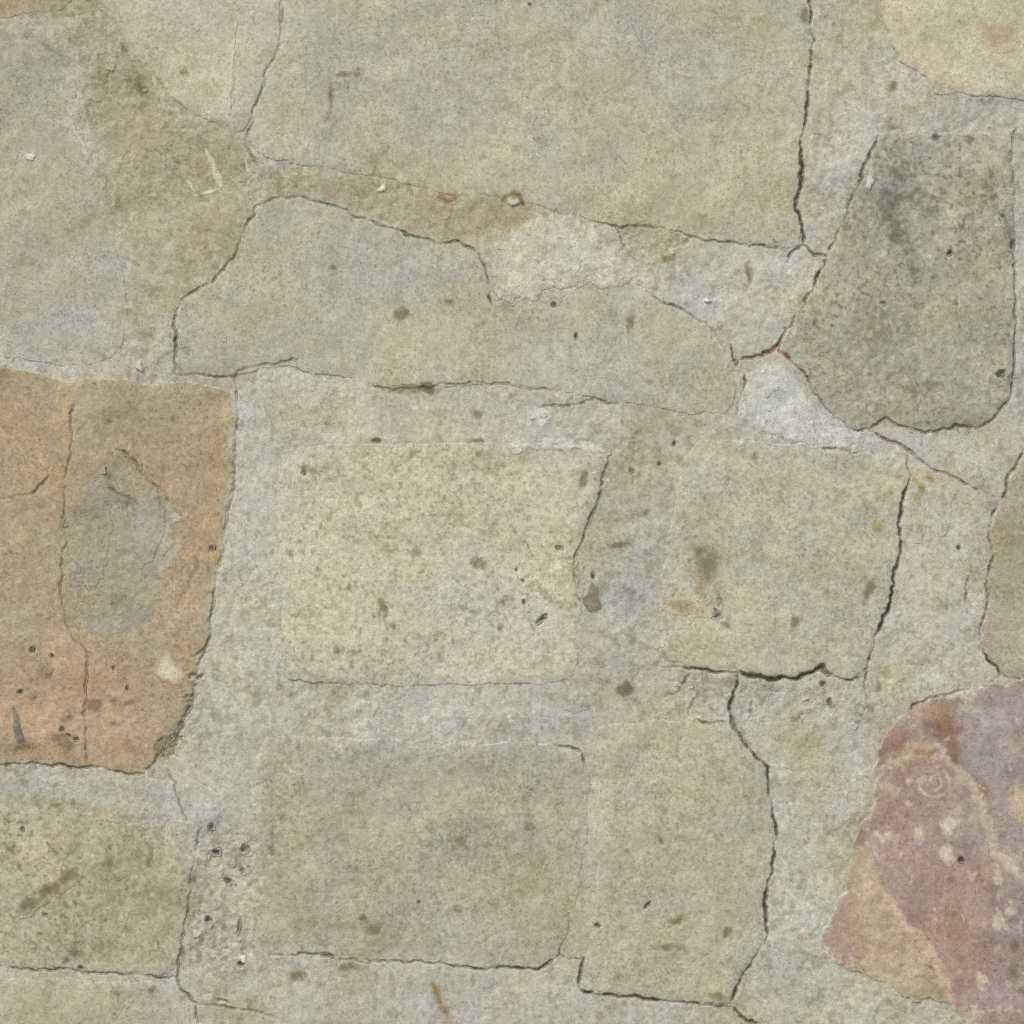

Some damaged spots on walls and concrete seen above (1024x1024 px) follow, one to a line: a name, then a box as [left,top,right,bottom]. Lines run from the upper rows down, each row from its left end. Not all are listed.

crack [246,10,283,165]
crack [0,196,492,1023]
crack [273,0,1024,1024]